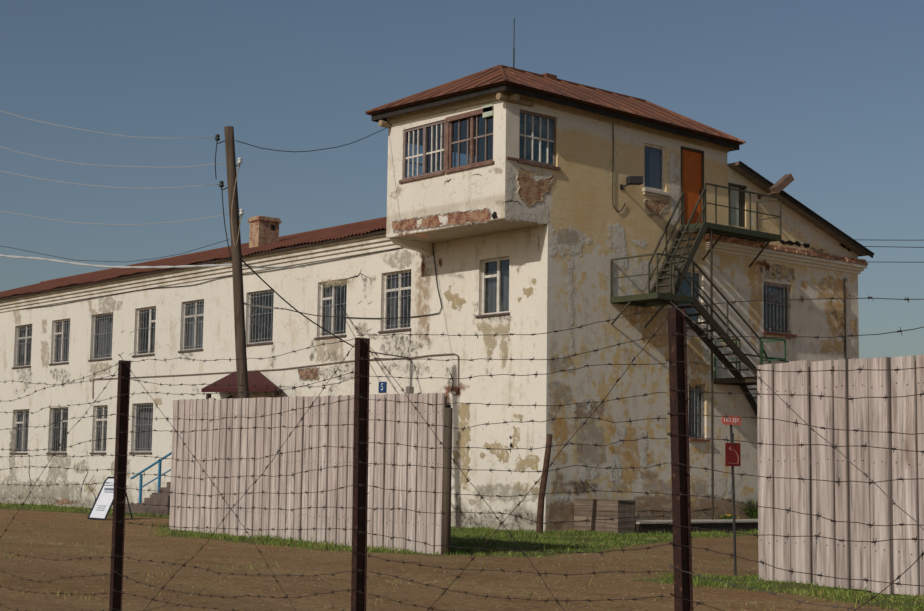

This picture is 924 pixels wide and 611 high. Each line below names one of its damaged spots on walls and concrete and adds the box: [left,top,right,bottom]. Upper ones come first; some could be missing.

spalling [392,208,492,237]
spalling [504,165,592,257]
peeling [607,223,653,291]
peeling [644,152,681,226]
peeling [444,285,466,311]
leakage [477,321,510,366]
peeling [818,277,857,354]
peeling [452,403,541,494]
spalling [547,354,672,529]